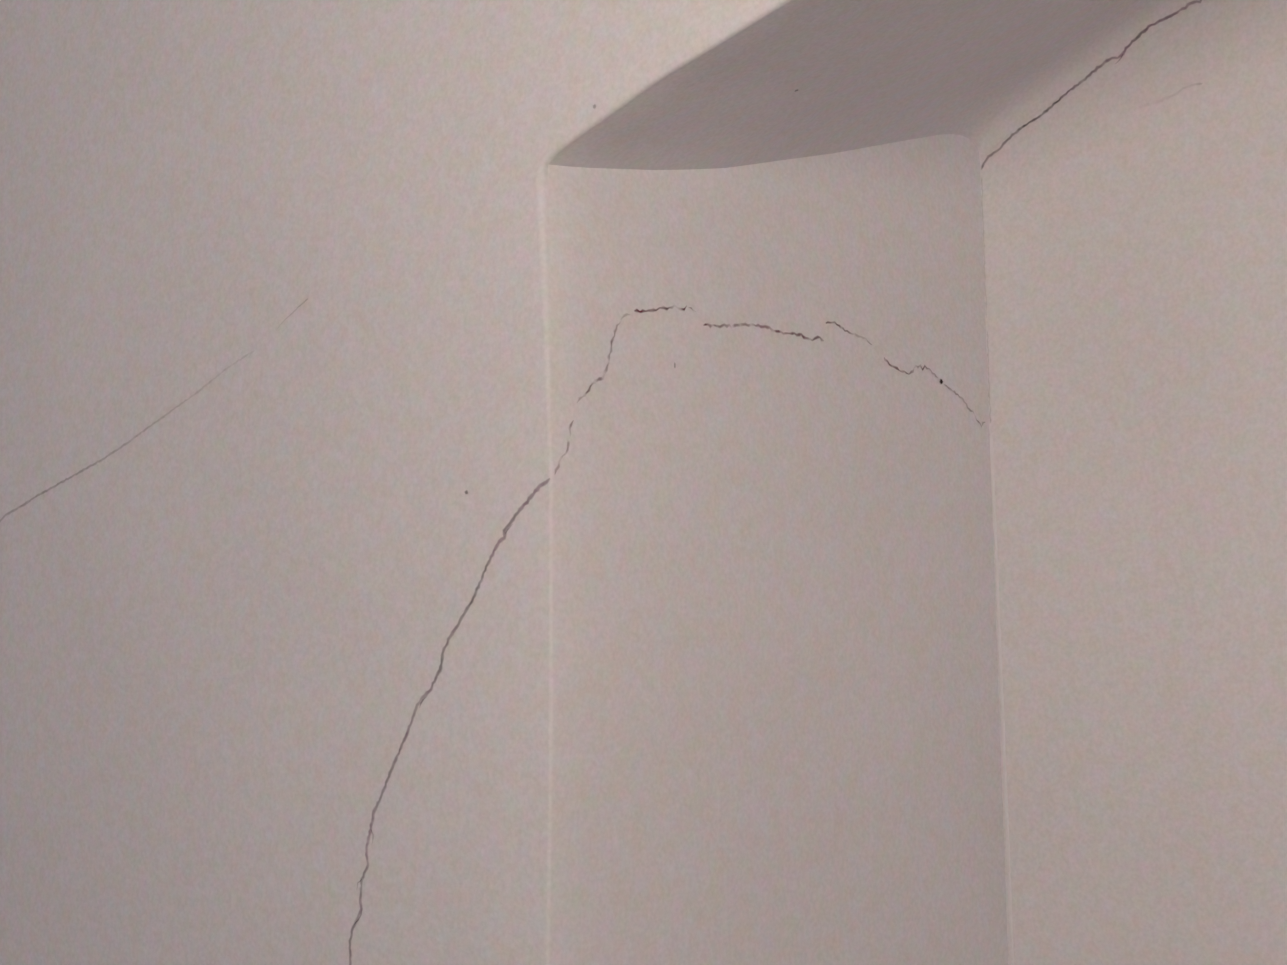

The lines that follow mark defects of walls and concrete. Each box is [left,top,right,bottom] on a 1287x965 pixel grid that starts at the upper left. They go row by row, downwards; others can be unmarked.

crack [1023,13,1176,127]